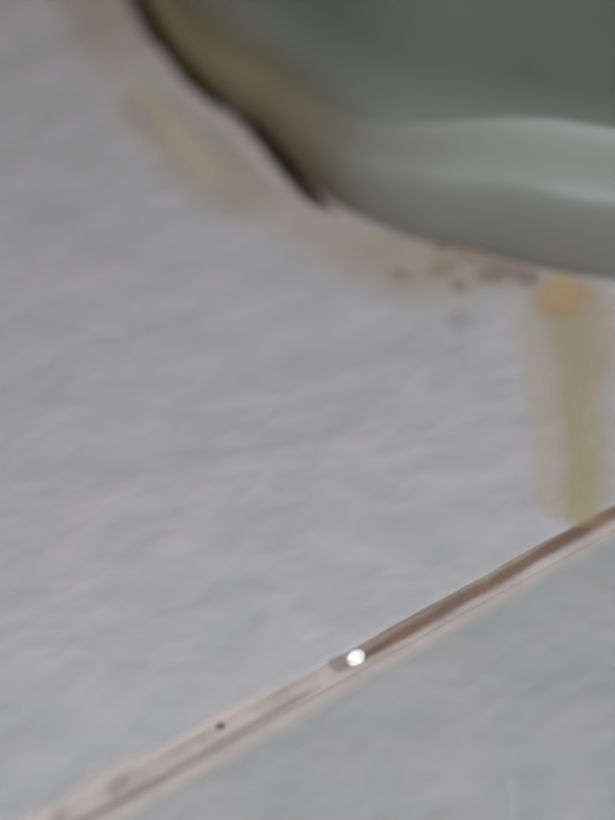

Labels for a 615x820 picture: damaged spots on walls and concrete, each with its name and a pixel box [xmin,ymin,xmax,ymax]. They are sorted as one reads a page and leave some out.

water stain [144,0,322,188]